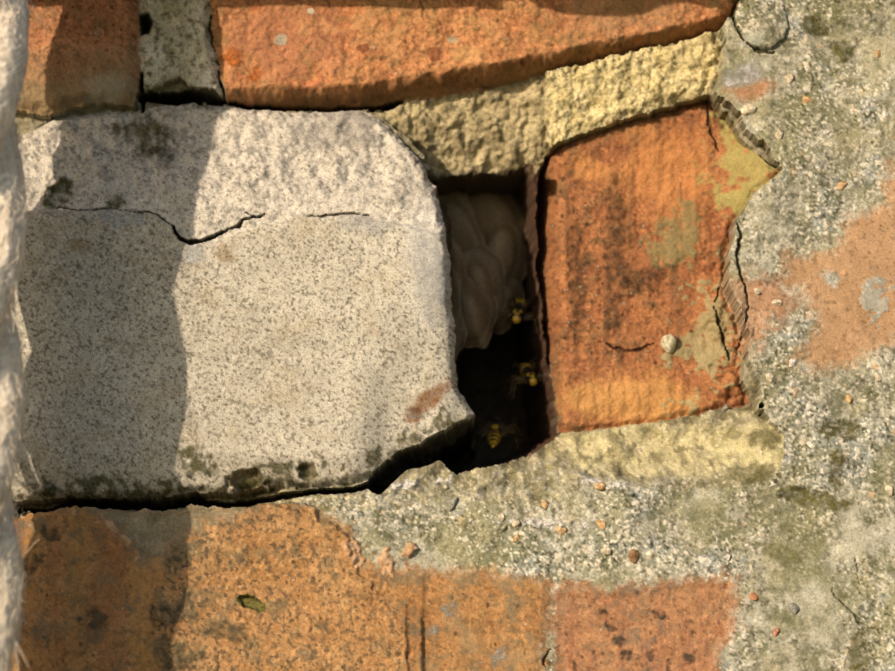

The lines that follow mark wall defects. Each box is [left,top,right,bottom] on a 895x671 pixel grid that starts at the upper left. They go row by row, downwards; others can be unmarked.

crack [706,101,720,152]
crack [59,207,268,245]
crack [307,211,362,219]
crack [714,220,750,361]
peeling [721,158,895,376]
peeling [223,468,266,496]
crack [14,419,476,515]
spalling [91,502,419,671]